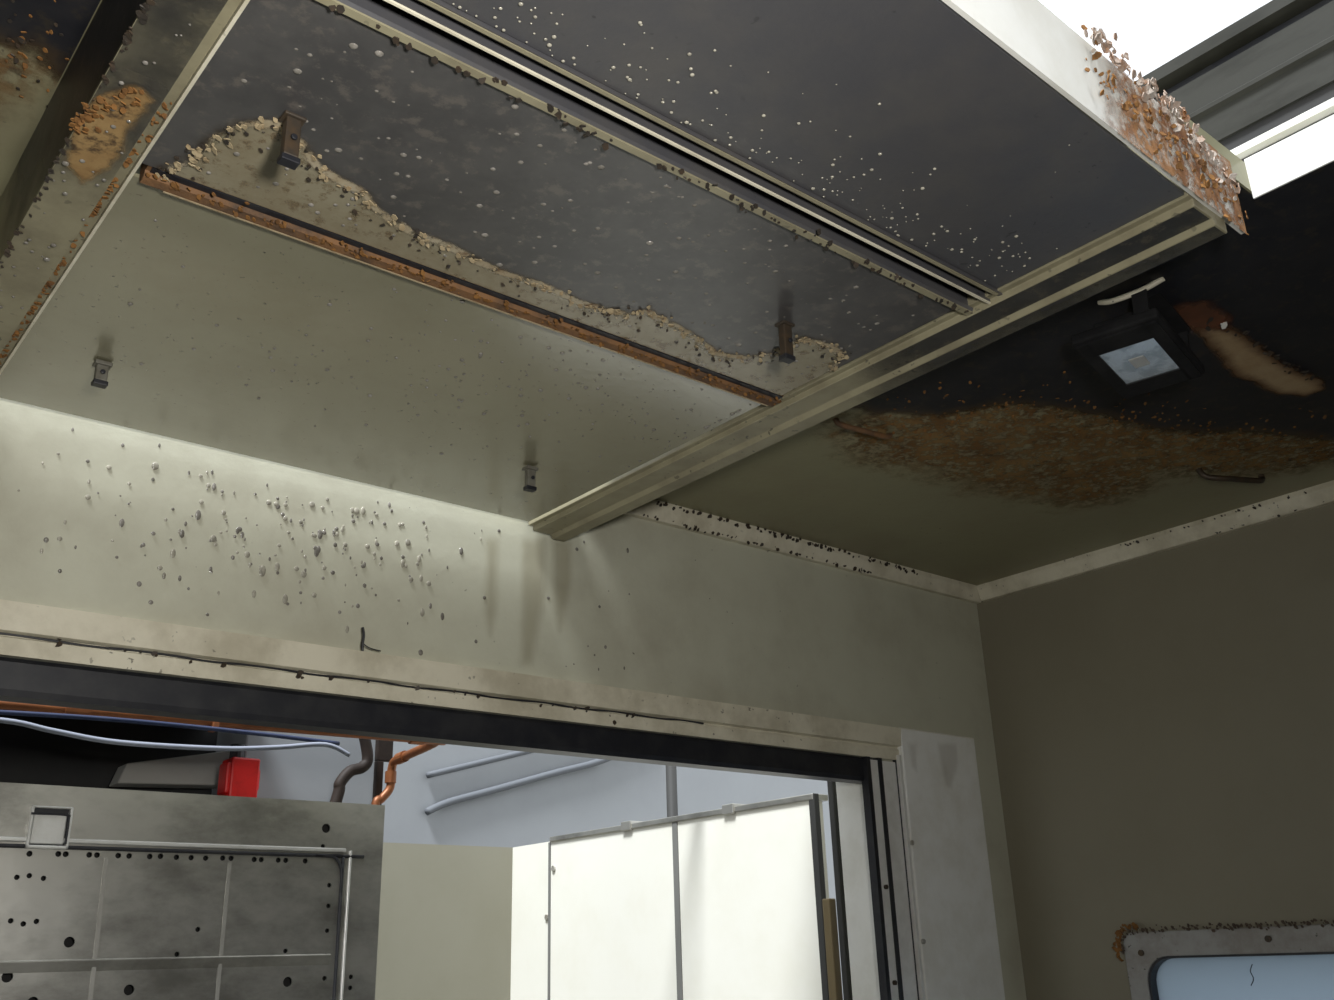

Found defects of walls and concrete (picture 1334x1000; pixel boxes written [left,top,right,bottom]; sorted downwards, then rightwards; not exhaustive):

peeling [75,0,156,127]
peeling [376,24,413,50]
peeling [455,66,522,103]
peeling [547,103,613,151]
corrosion [1081,25,1249,235]
peeling [657,163,836,254]
peeling [1175,301,1325,396]